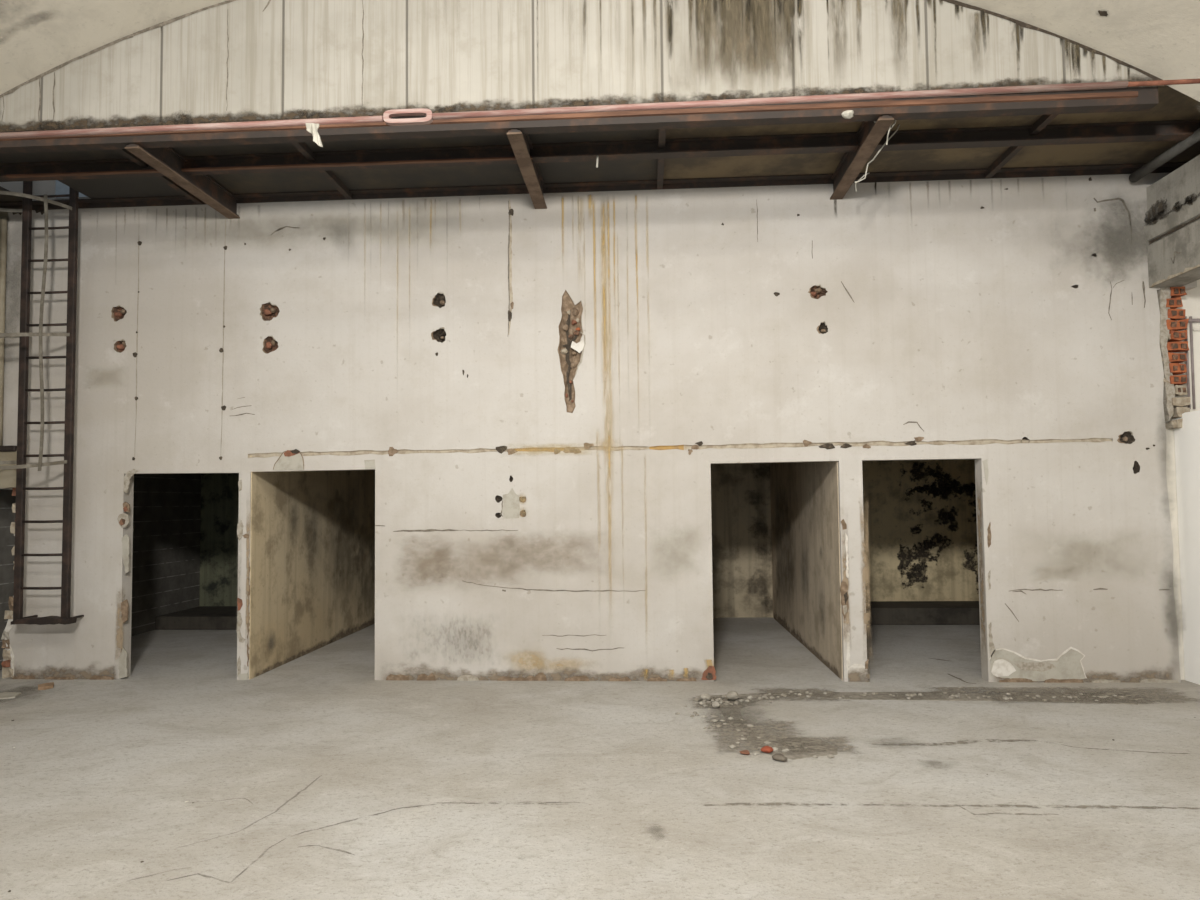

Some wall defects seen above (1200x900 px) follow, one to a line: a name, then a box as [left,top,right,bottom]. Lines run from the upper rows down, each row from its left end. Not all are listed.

leakage [632,0,672,41]
leakage [689,0,803,60]
leakage [892,0,989,44]
leakage [1010,20,1023,58]
leakage [1060,38,1130,77]
corrosion [589,195,615,330]
spalling [558,290,586,413]
spalling [1151,264,1200,429]
spalling [0,451,17,570]
leakage [897,462,979,592]
corrosion [701,660,716,680]
peeling [988,622,1179,683]